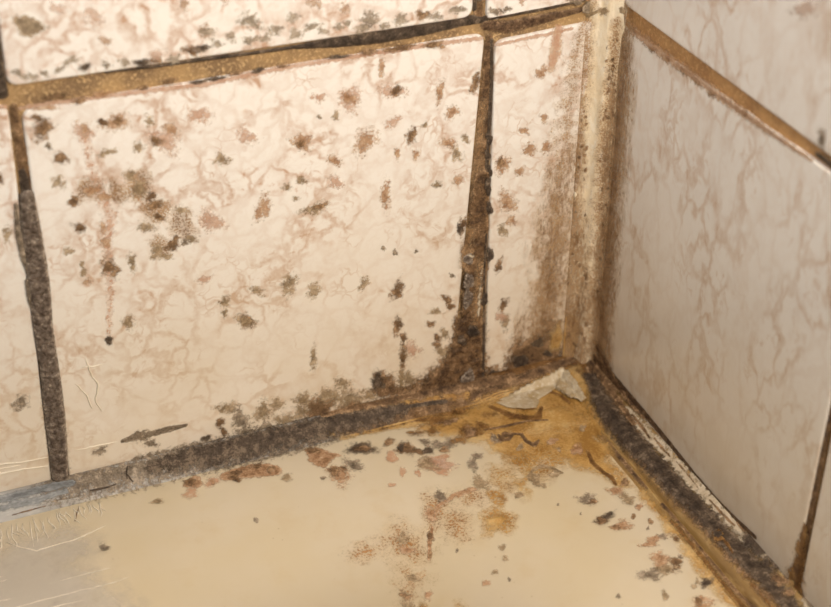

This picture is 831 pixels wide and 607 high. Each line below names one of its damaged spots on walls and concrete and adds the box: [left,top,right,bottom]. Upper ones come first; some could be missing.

damp [0,47,9,99]
damp [14,15,44,38]
damp [103,24,235,69]
damp [241,0,525,45]
damp [359,41,445,97]
damp [30,92,69,164]
damp [442,33,524,202]
damp [68,169,224,260]
peeling [496,367,586,409]
damp [121,424,188,446]
damp [382,453,528,563]
damp [638,544,736,607]